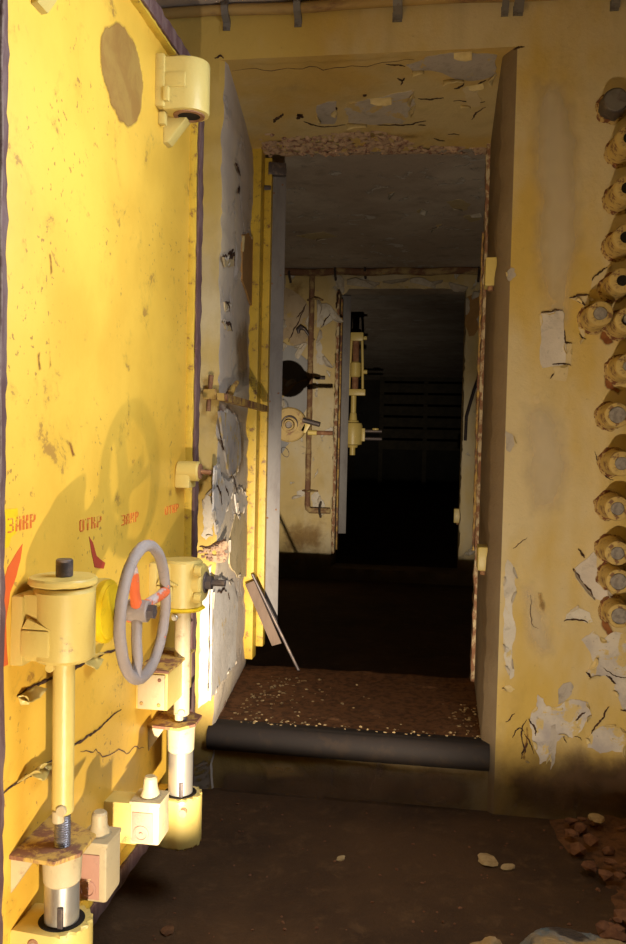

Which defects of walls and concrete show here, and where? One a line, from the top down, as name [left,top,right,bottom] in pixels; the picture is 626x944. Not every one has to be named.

crack [215,54,486,141]
spalling [259,90,487,158]
peeling [406,51,497,109]
peeling [282,275,344,414]
peeling [539,309,585,381]
peeling [198,408,248,708]
peeling [573,549,613,600]
peeling [502,559,518,692]
peeling [564,606,626,712]
peeling [524,682,626,770]